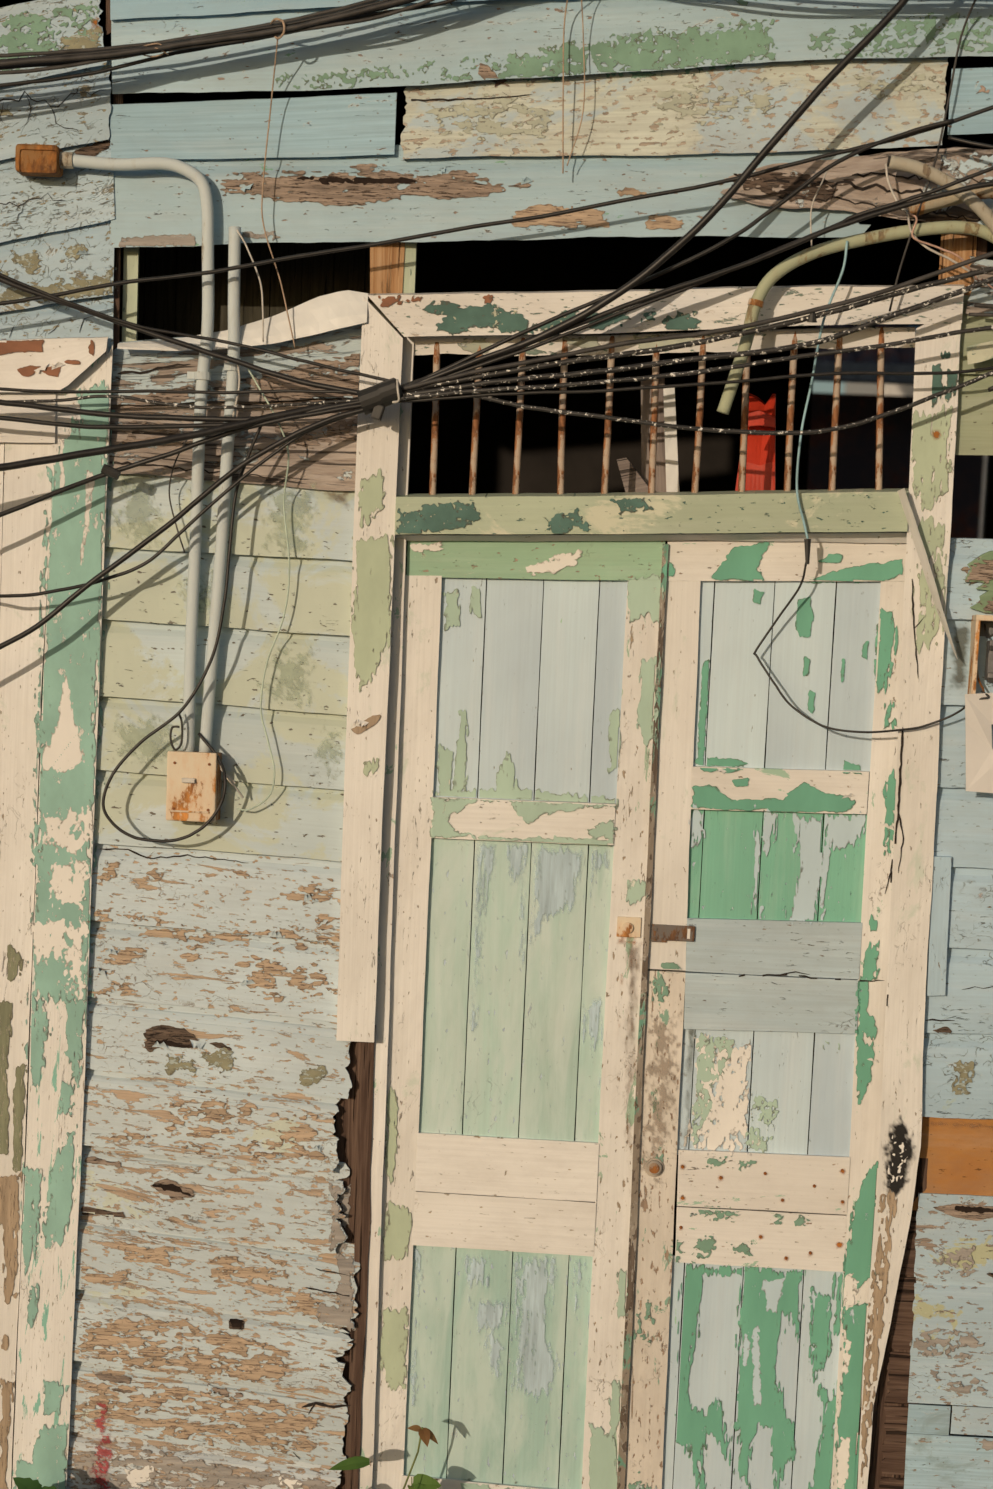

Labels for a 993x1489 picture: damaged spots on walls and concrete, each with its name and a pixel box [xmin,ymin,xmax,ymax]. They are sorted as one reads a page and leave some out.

peeling [0,1,102,71]
peeling [0,244,118,303]
peeling [119,234,196,247]
spalling [297,176,419,185]
peeling [0,339,95,377]
peeling [350,468,482,692]
peeling [429,710,618,847]
peeling [0,379,356,1332]
crack [926,986,993,1021]
peeling [683,1032,779,1171]
peeling [669,1135,908,1489]
peeling [0,1311,337,1489]